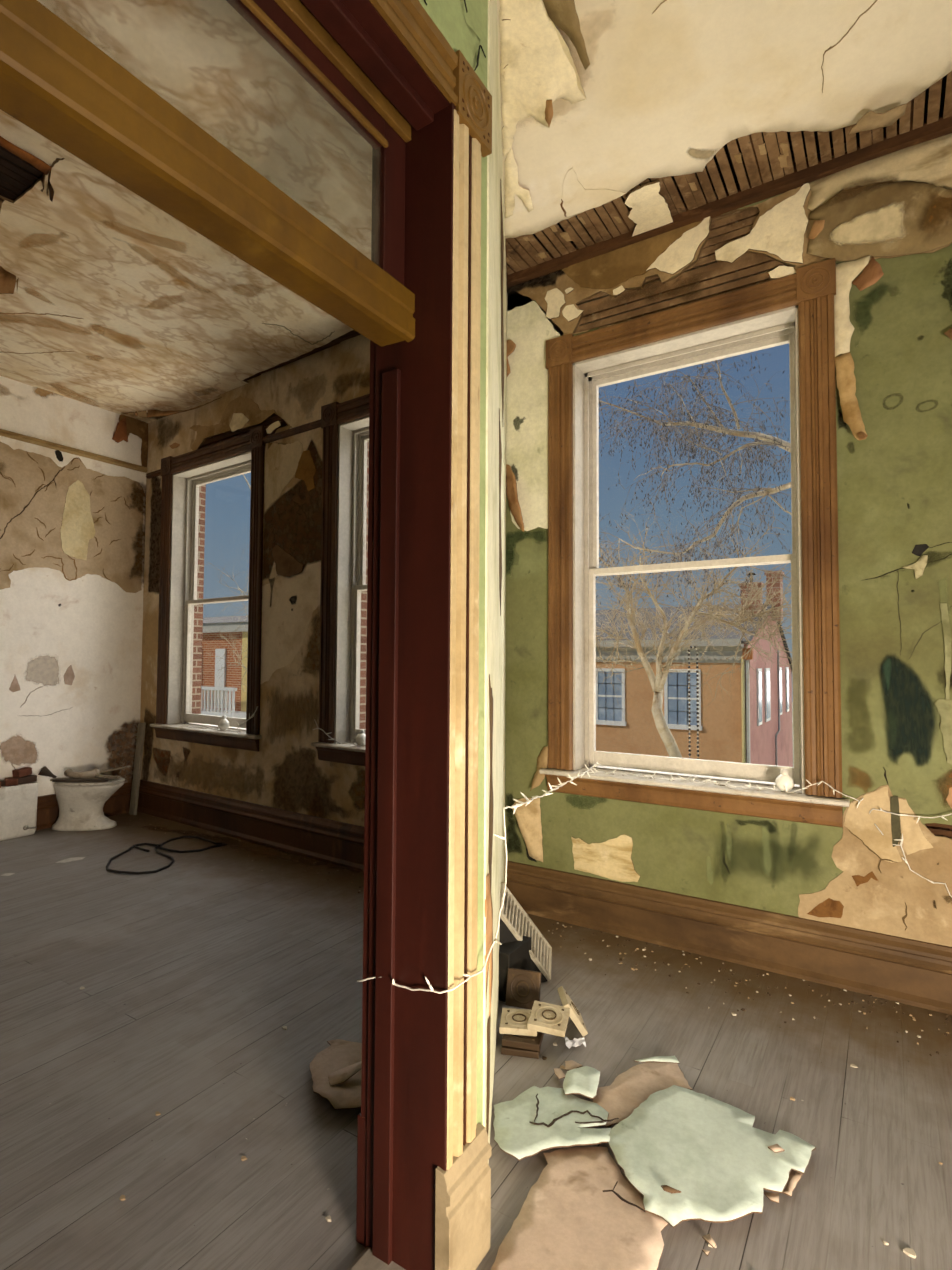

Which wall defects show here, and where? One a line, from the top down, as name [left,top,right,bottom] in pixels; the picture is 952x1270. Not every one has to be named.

crack [821,0,877,93]
peeling [499,0,952,616]
crack [0,457,81,539]
crack [42,556,77,581]
crack [865,568,952,659]
flaking render [9,675,20,692]
flaking render [64,665,75,685]
flaking render [798,785,952,947]
peeling [484,674,816,1228]